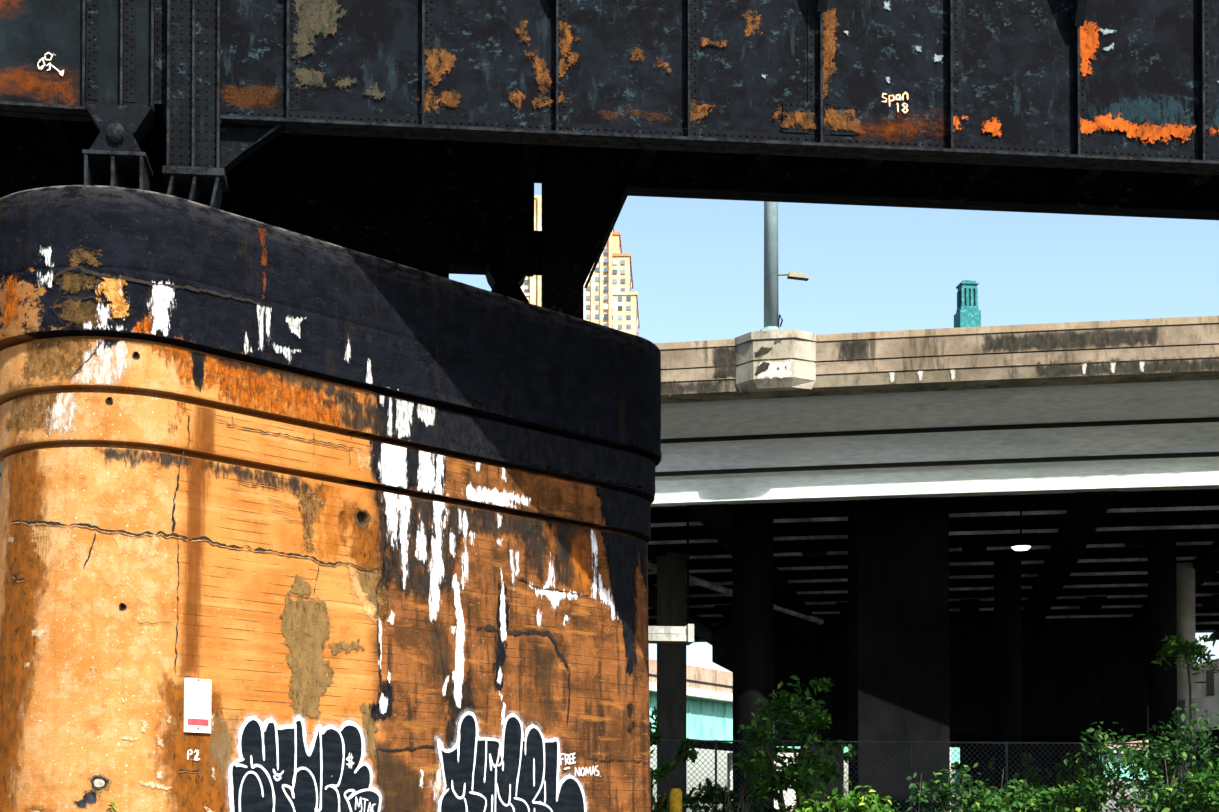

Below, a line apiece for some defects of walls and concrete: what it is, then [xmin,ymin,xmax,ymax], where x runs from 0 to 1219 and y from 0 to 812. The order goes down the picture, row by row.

peeling [292,0,385,100]
spalling [6,245,130,434]
crack [6,415,389,688]
spalling [280,574,365,719]
crack [434,620,449,690]